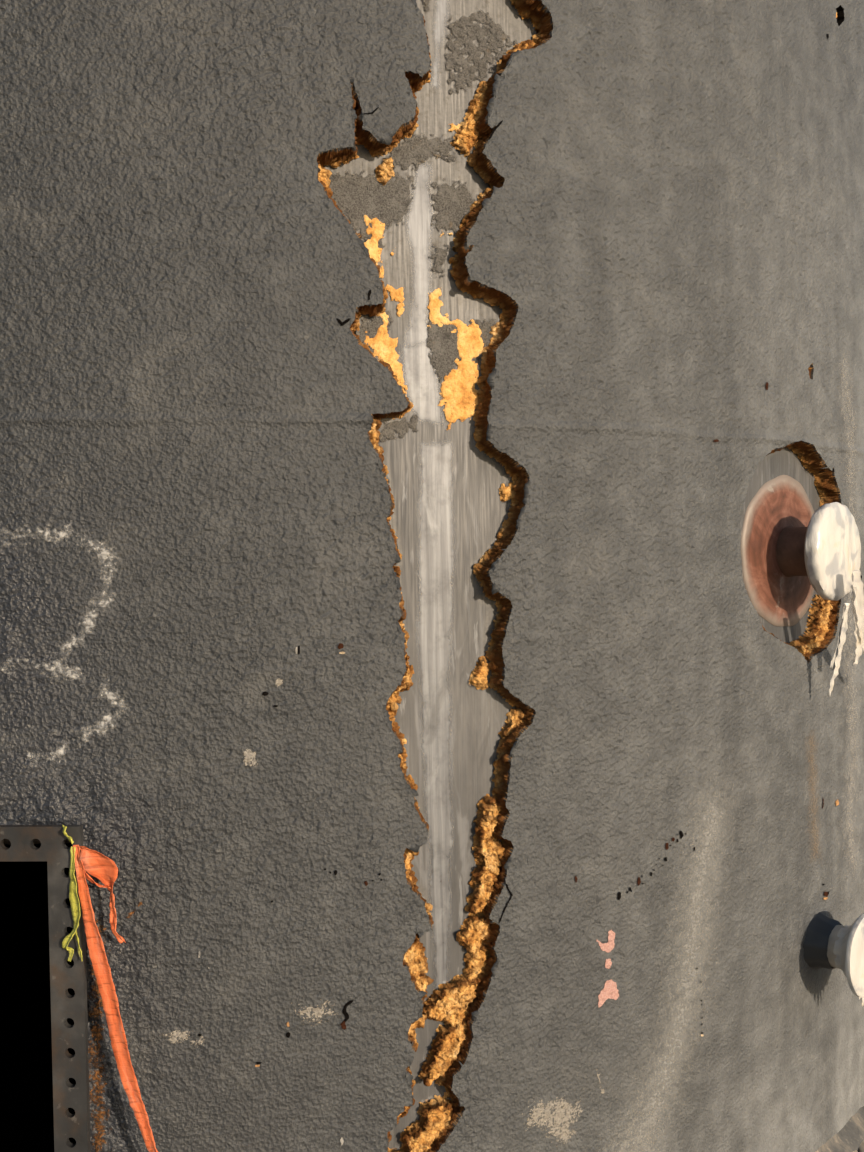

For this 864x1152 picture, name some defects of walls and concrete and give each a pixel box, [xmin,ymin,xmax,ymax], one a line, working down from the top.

spalling [836,5,845,26]
spalling [323,0,537,1000]
spalling [740,440,841,595]
spalling [758,590,841,664]
spalling [388,1018,451,1150]